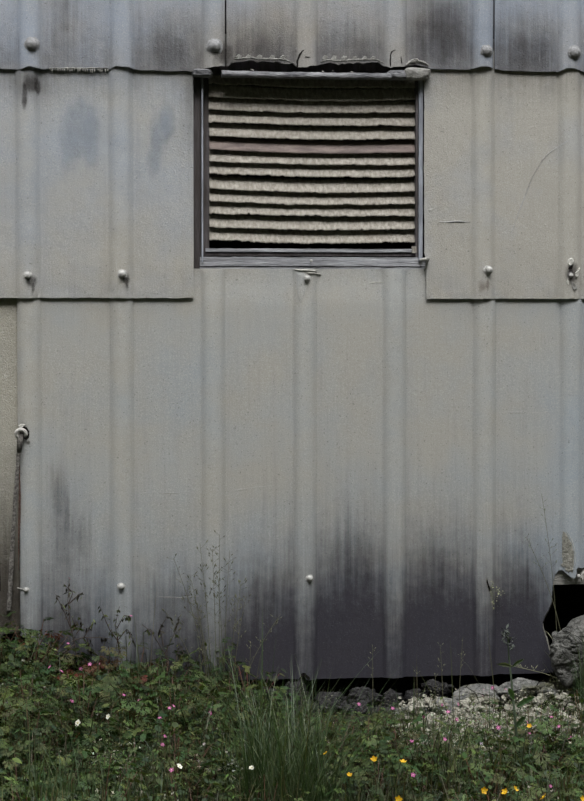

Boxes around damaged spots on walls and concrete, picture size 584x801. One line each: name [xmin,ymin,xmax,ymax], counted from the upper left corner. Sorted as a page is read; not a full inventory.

spalling [561,531,584,581]